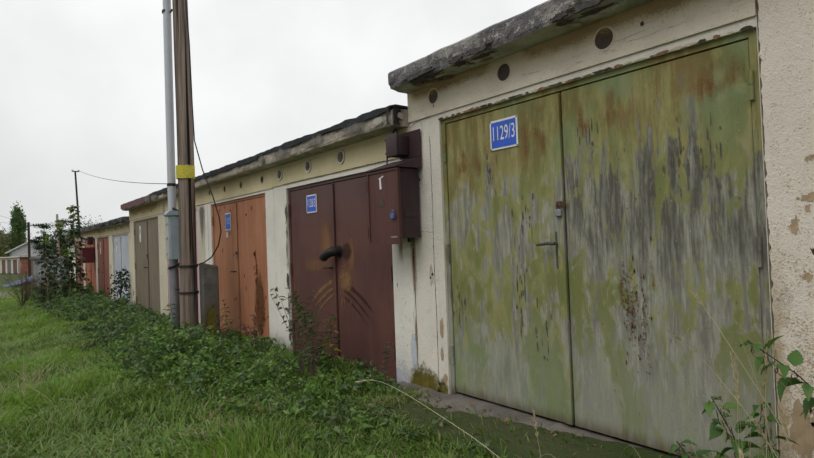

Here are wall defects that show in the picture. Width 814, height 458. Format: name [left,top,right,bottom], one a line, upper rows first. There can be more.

peeling [788,216,798,235]
peeling [796,192,814,212]
corrosion [244,252,266,340]
corrosion [314,245,368,314]
corrosion [619,246,654,347]
peeling [782,398,814,458]